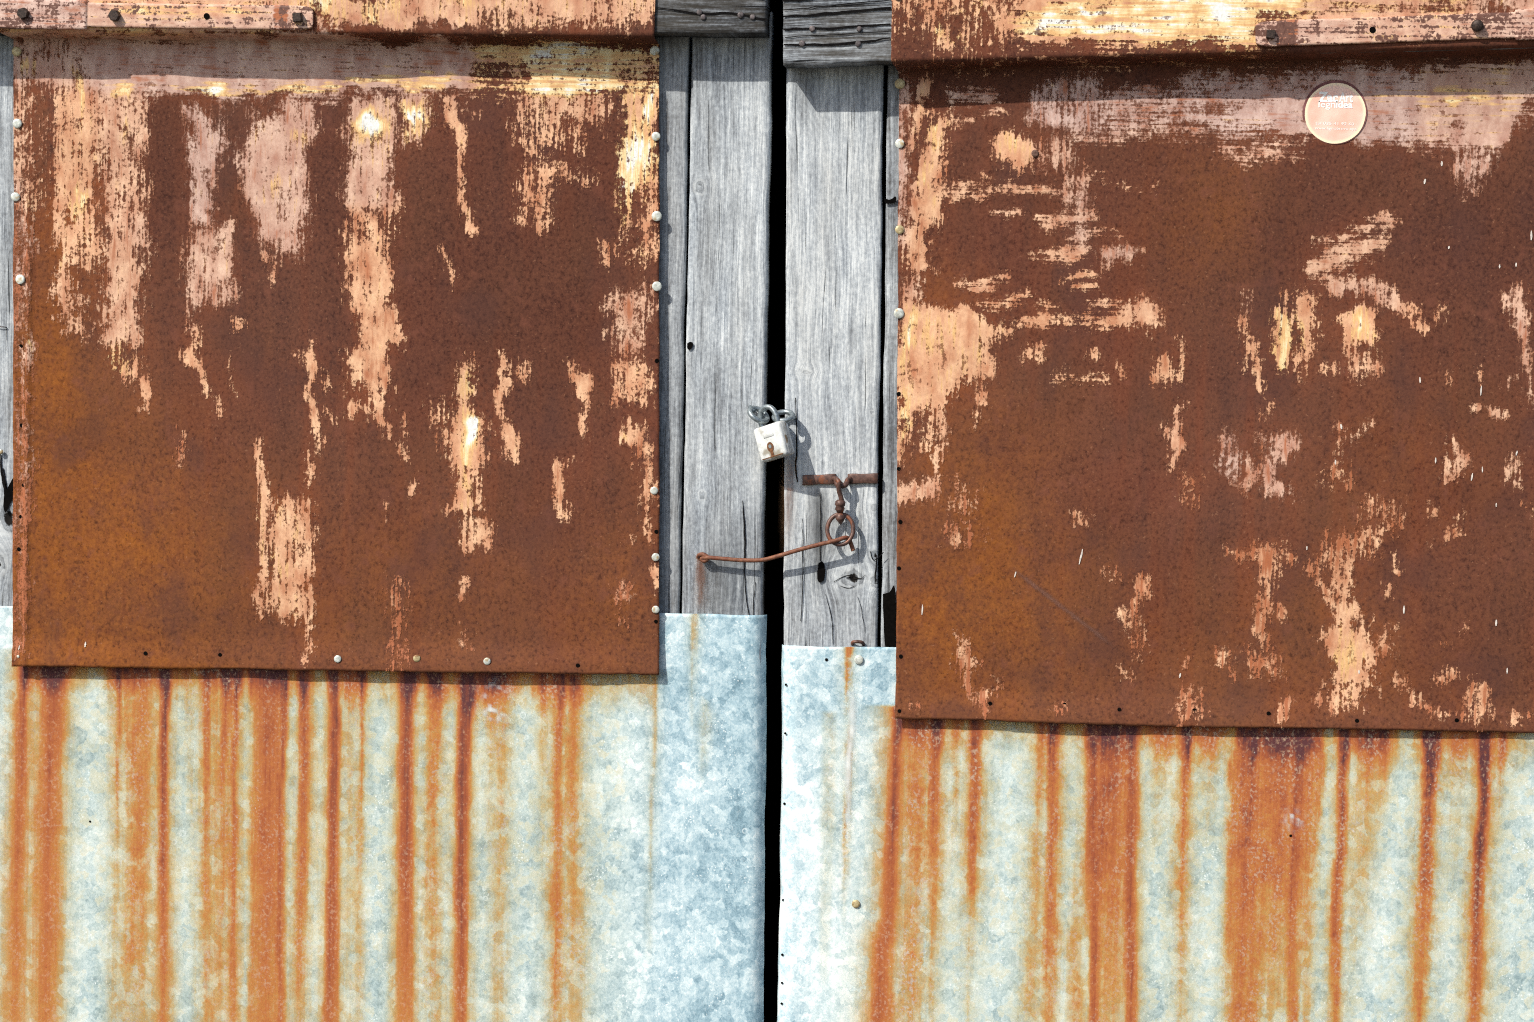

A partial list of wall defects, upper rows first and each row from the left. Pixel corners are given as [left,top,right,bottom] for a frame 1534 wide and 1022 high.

rust [0,0,662,1022]
rust [860,0,1534,1022]